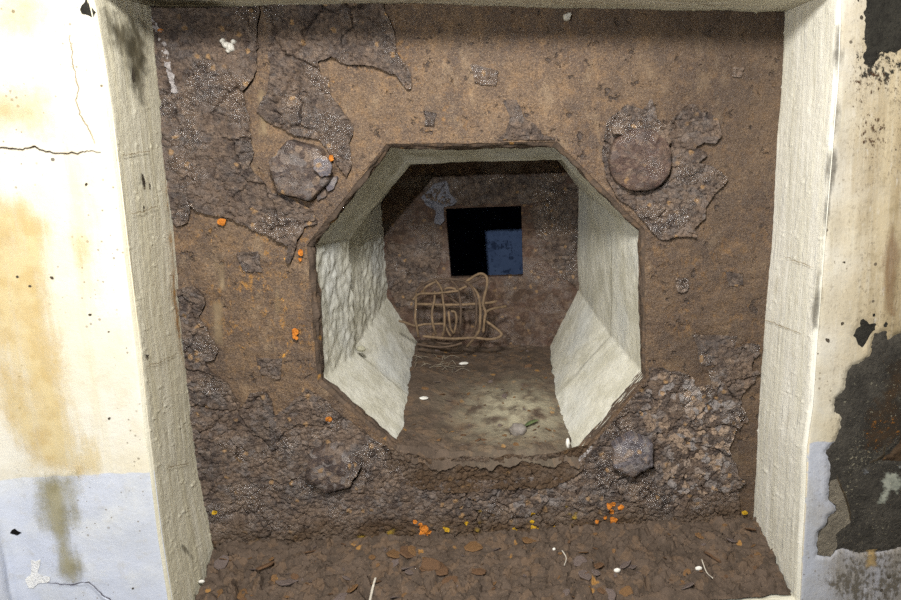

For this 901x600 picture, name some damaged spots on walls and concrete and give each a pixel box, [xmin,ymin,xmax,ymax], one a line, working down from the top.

crack [0,36,95,154]
peeling [856,0,901,85]
leakage [0,206,65,465]
peeling [816,313,901,600]
leakage [42,479,81,578]
crack [48,582,111,600]